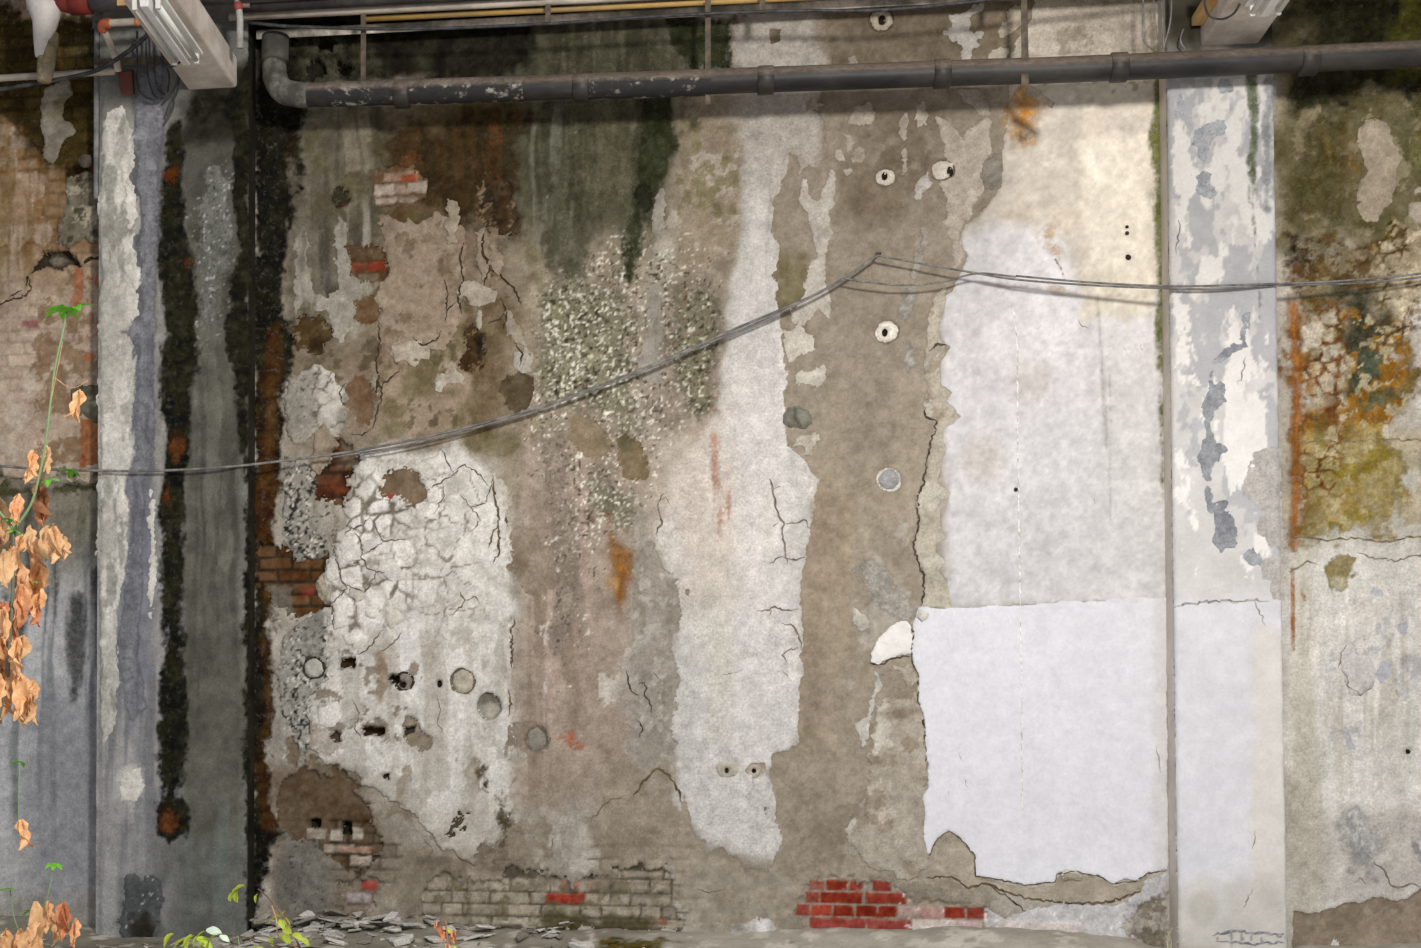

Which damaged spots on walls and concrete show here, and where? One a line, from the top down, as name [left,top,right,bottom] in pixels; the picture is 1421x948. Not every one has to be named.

damp [277,7,538,82]
damp [1285,0,1421,45]
damp [1291,67,1421,110]
damp [292,217,362,343]
spalling [0,105,142,744]
flaking render [255,538,331,618]
crack [306,229,524,866]
rust [609,534,632,602]
flaking render [418,79,1169,932]
crack [870,407,938,761]
peeling [1197,312,1285,600]
crack [927,831,1167,911]